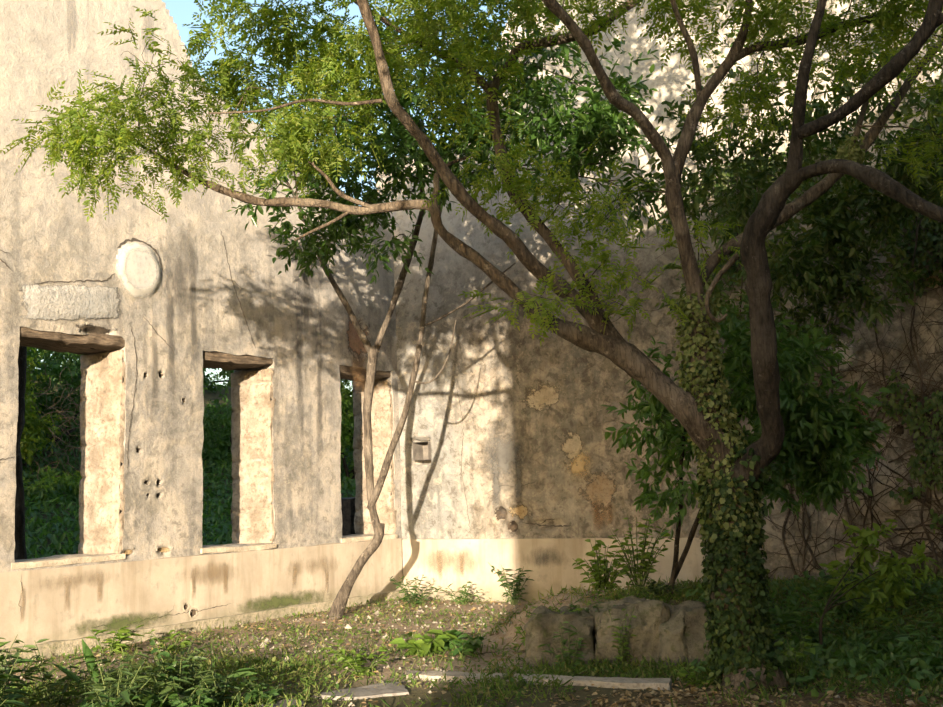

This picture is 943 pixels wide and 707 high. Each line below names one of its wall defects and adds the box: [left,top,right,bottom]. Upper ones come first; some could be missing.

crack [18,274,114,291]
spalling [559,430,620,512]